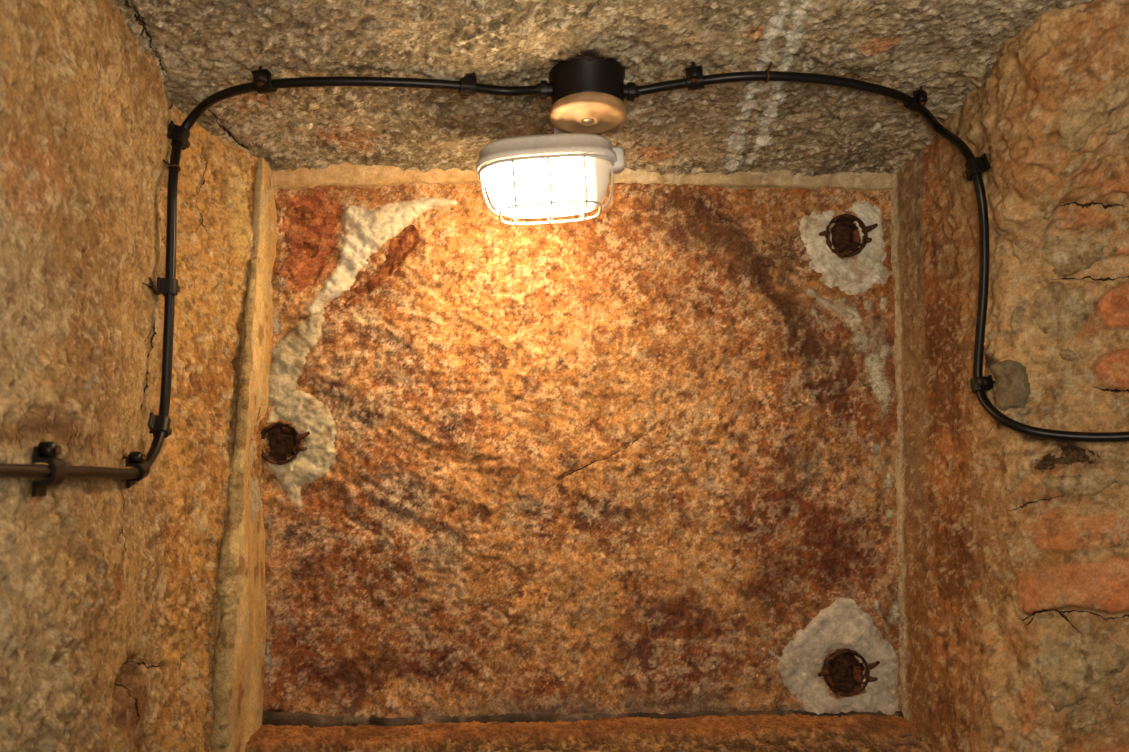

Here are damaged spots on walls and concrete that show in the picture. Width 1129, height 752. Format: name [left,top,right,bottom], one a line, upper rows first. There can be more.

efflorescence [722,0,813,171]
crack [1058,201,1125,209]
crack [1052,274,1129,282]
leakage [268,308,325,407]
crack [1092,385,1129,393]
crack [1018,609,1129,637]